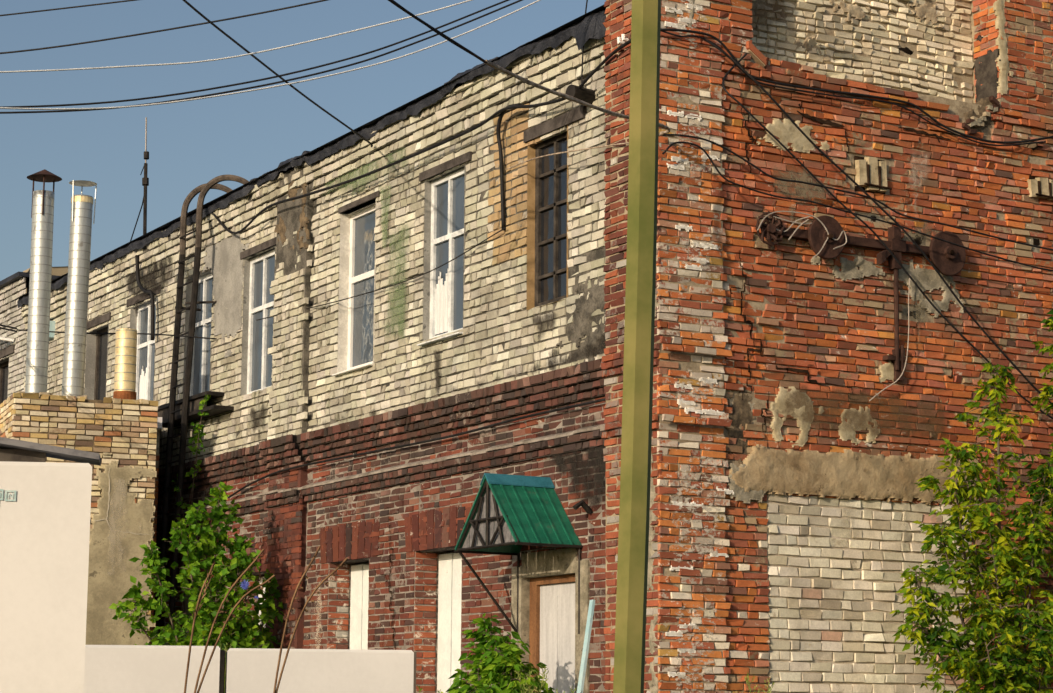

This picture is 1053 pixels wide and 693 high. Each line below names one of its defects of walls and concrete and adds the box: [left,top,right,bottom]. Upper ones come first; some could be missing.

crack [741,108,757,174]
water stain [675,225,719,271]
water stain [674,370,724,415]
spalling [724,380,757,464]
water stain [670,456,734,571]
water stain [665,604,717,693]